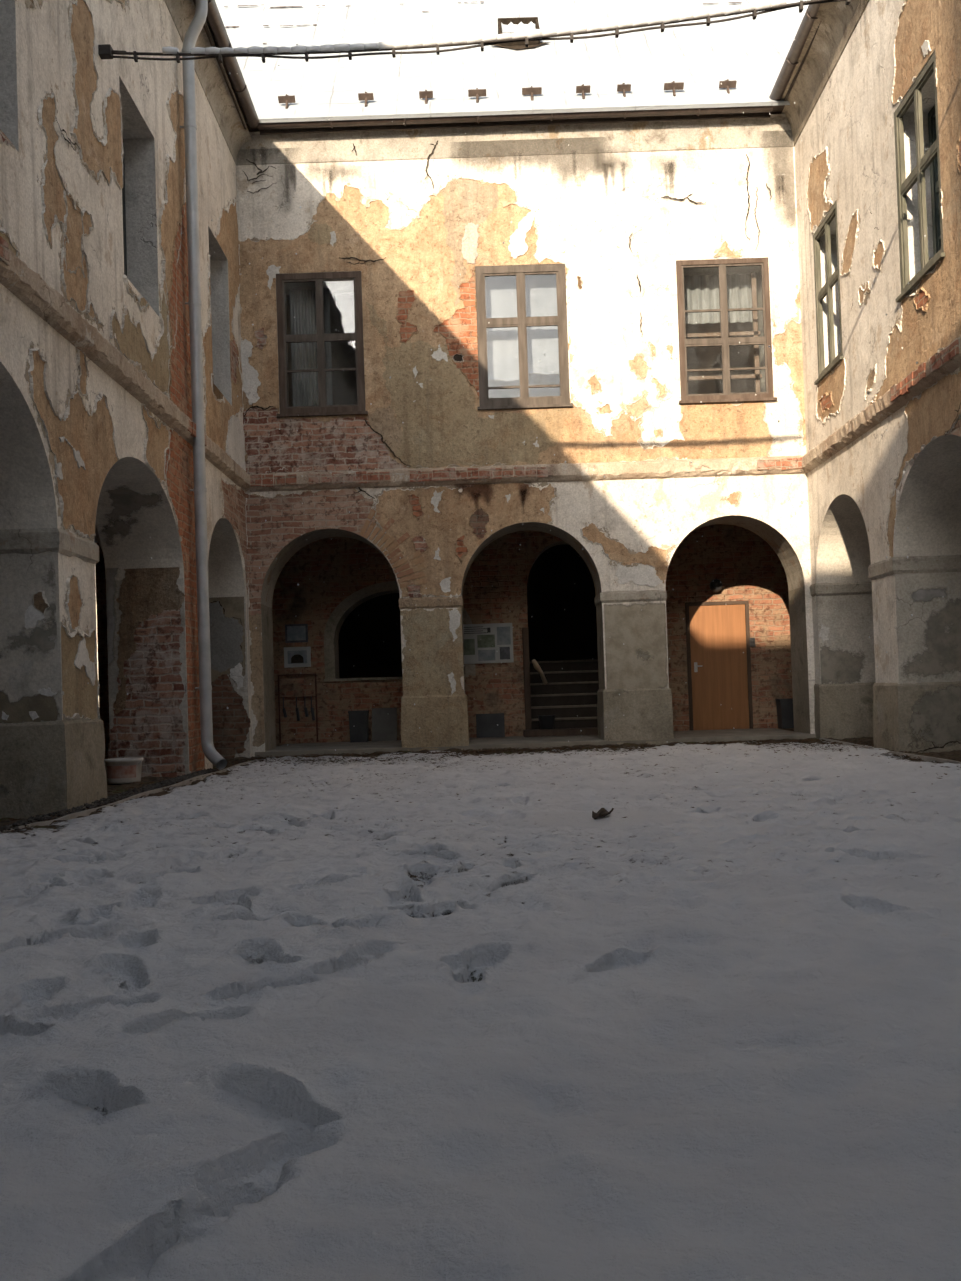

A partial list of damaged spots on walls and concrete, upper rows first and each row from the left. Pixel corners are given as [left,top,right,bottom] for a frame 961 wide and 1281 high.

leakage [462,137,618,183]
leakage [772,130,796,219]
peeling [840,209,886,306]
peeling [864,0,961,557]
peeling [24,0,847,777]